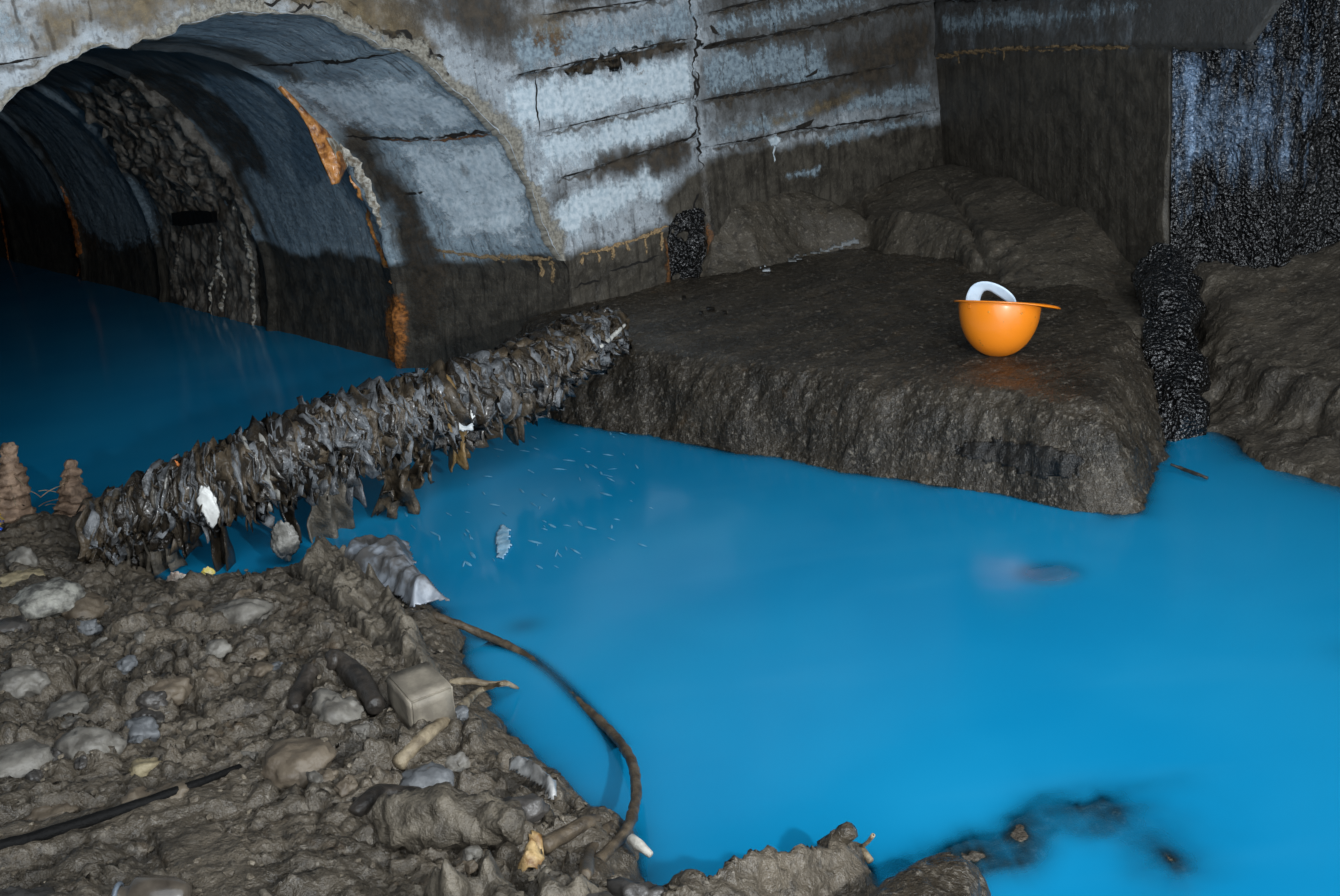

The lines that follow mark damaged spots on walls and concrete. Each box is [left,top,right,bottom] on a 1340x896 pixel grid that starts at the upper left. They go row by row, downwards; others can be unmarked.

water stain [208,232,227,314]
water stain [91,71,359,243]
water stain [232,206,257,325]
rust [278,86,409,368]
crack [674,0,704,174]
water stain [284,0,1134,326]